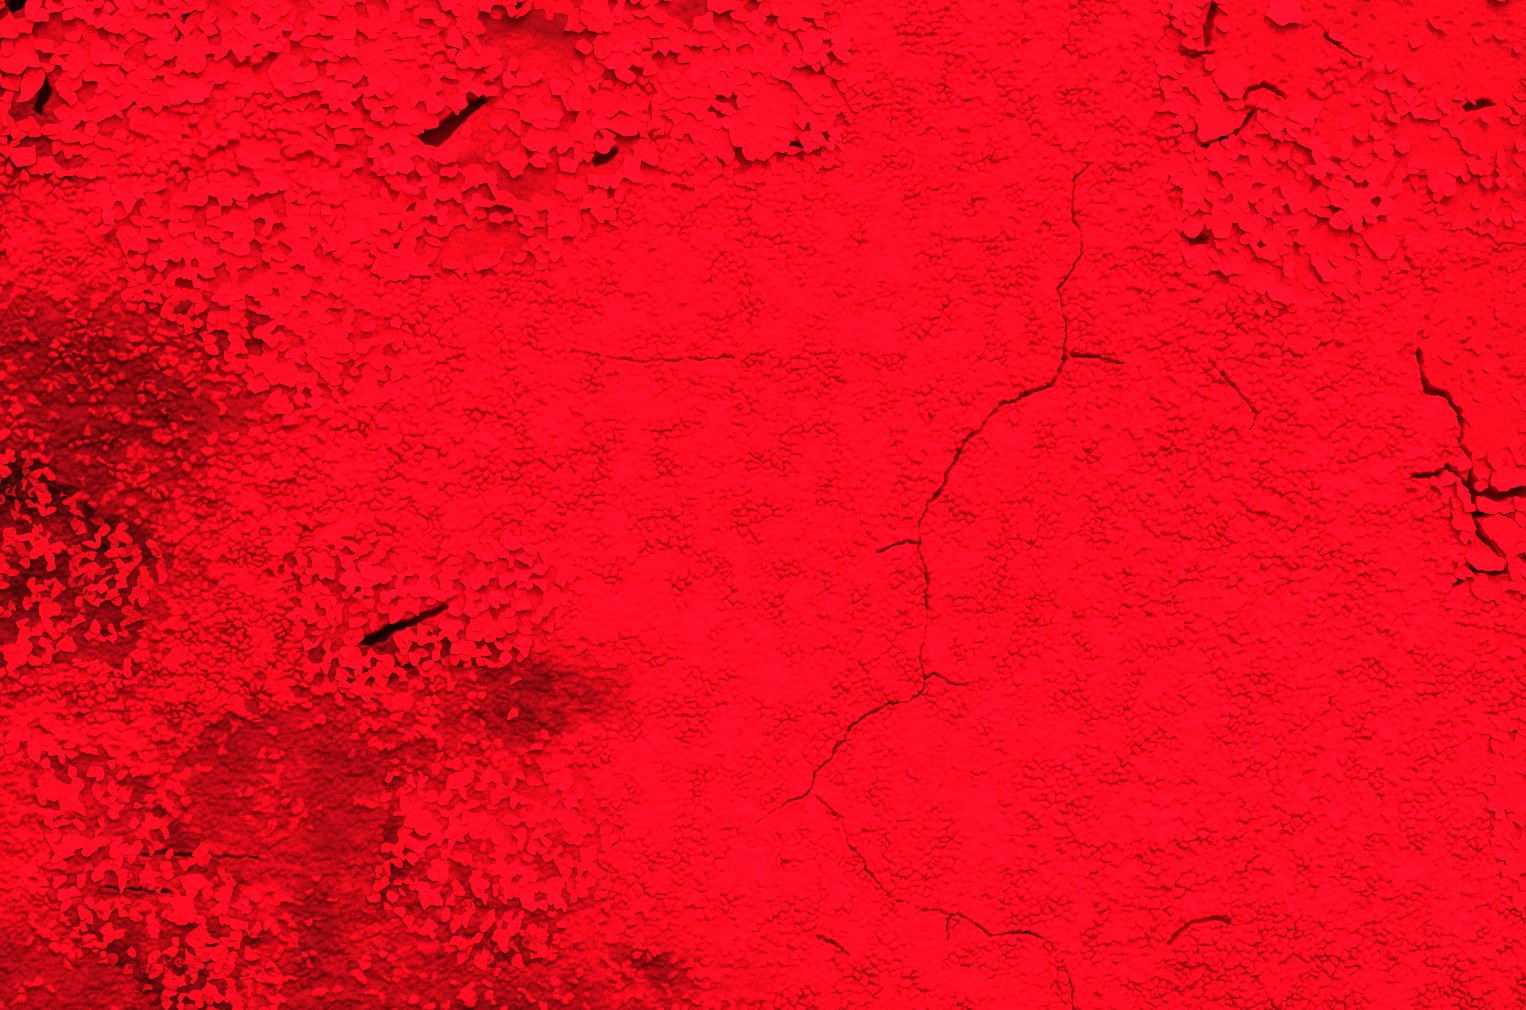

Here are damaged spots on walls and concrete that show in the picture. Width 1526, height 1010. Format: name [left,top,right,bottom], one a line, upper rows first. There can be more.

peeling [0,0,877,416]
peeling [278,529,637,971]
crack [755,162,1125,1010]
peeling [1154,0,1526,606]
crack [1411,348,1526,588]
peeling [1481,711,1526,918]